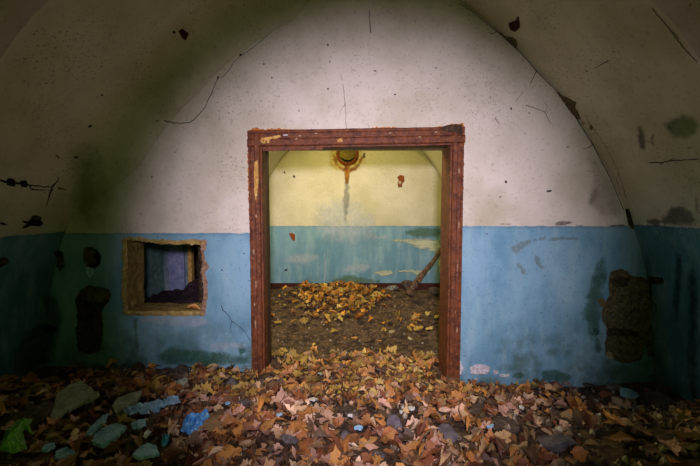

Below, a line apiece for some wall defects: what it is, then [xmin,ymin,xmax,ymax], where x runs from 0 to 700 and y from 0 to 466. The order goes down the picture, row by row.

crack [164,29,275,124]
crack [461,4,556,124]
crack [0,176,65,206]
spalling [22,215,43,228]
rust [334,156,363,212]
crack [575,117,626,210]
crack [649,157,698,165]
spalling [75,247,111,355]
spalling [598,269,664,363]
peeling [460,361,509,377]